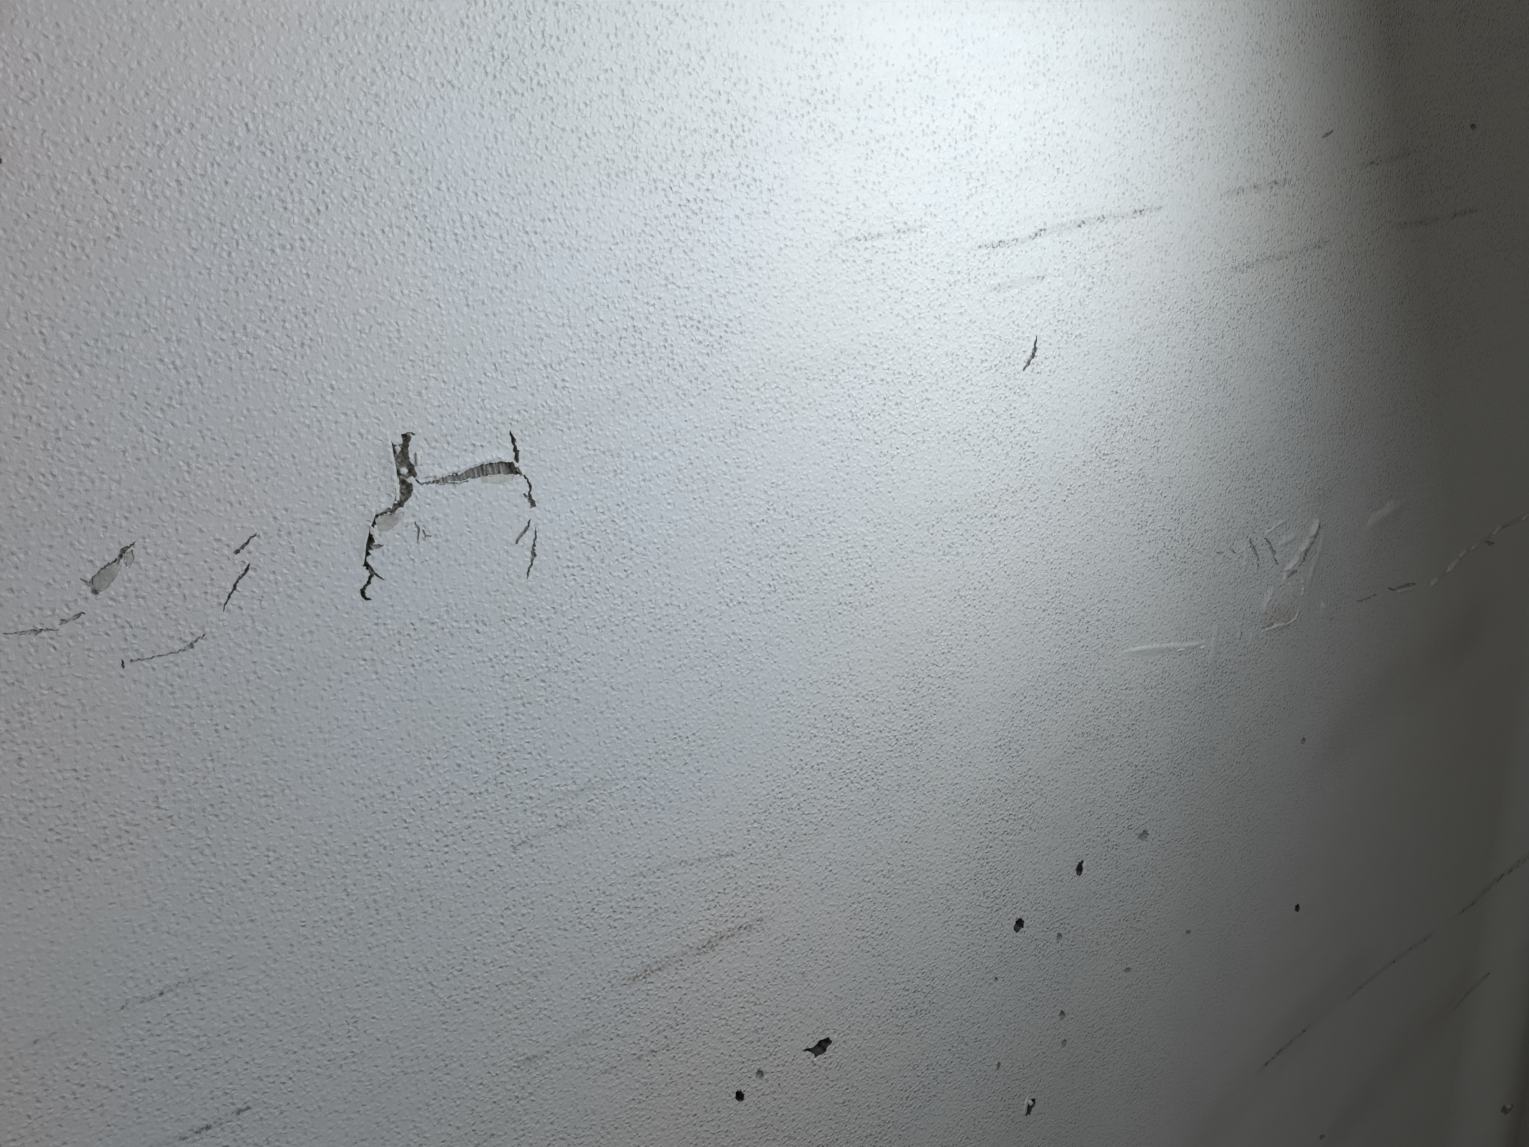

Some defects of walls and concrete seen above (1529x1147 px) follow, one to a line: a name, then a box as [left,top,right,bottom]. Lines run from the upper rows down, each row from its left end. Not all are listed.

crack [353,429,537,601]
crack [2,612,86,636]
crack [121,532,257,669]
spalling [803,1035,837,1064]